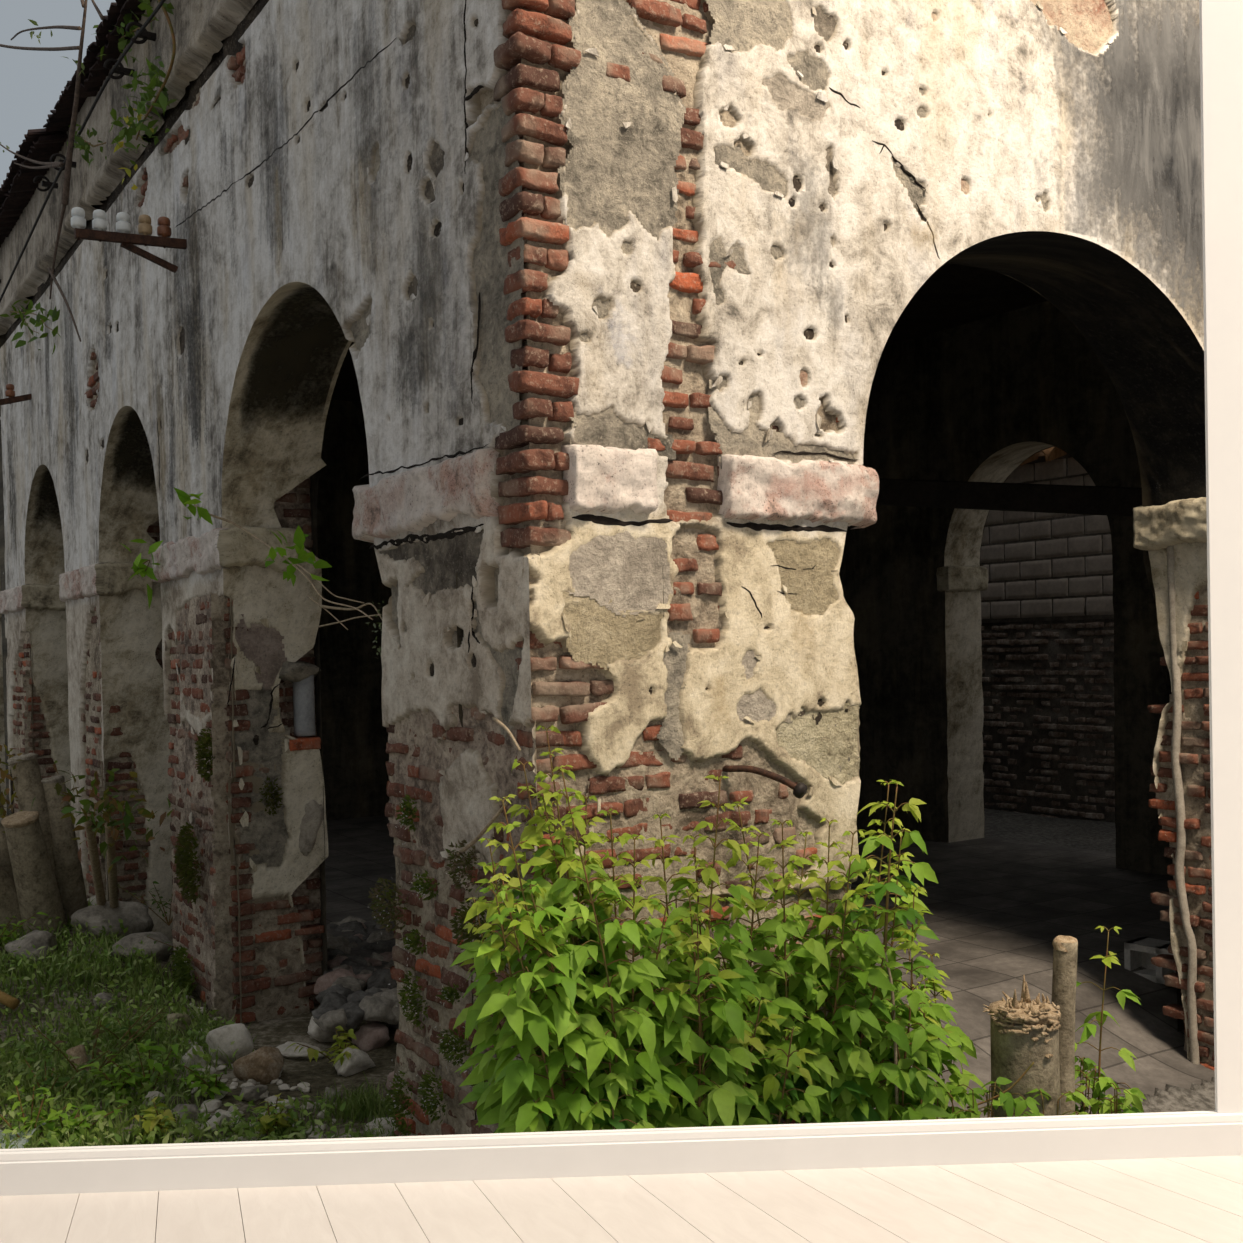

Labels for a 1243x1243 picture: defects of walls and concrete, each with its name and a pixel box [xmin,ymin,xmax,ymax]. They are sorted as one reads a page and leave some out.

spalling [1030,0,1113,53]
crack [872,140,940,259]
damp [1055,0,1204,322]
flaking render [274,477,313,552]
crack [359,444,488,480]
crack [370,524,484,550]
peeling [379,0,860,1137]
crack [572,514,673,526]
crack [773,451,858,460]
flaking render [79,606,151,904]
flaking render [155,592,325,1027]
flaking render [1147,581,1215,1071]